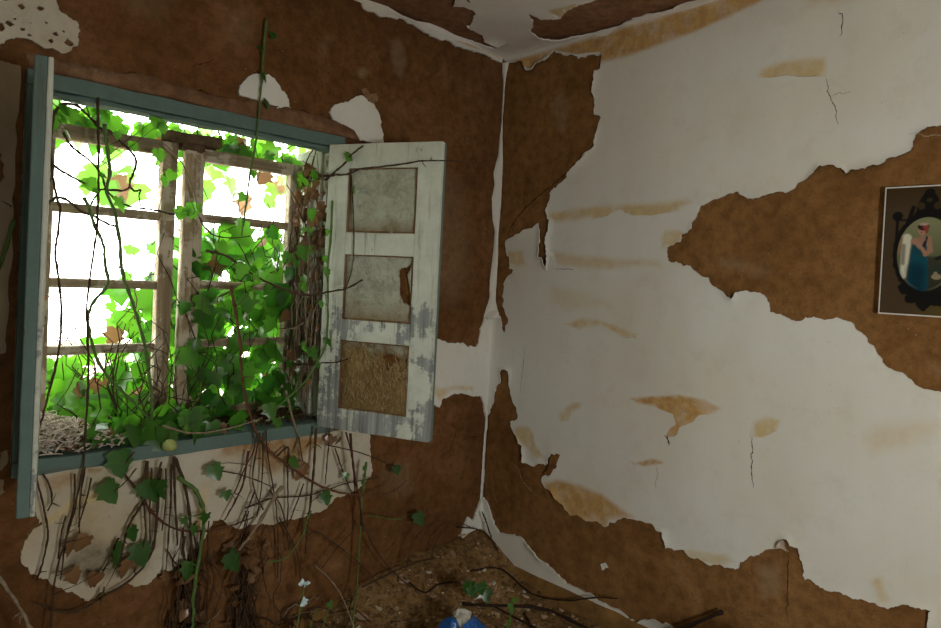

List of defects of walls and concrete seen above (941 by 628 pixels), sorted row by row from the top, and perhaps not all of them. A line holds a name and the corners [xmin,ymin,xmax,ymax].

flaking render [328,88,384,143]
flaking render [357,0,941,628]